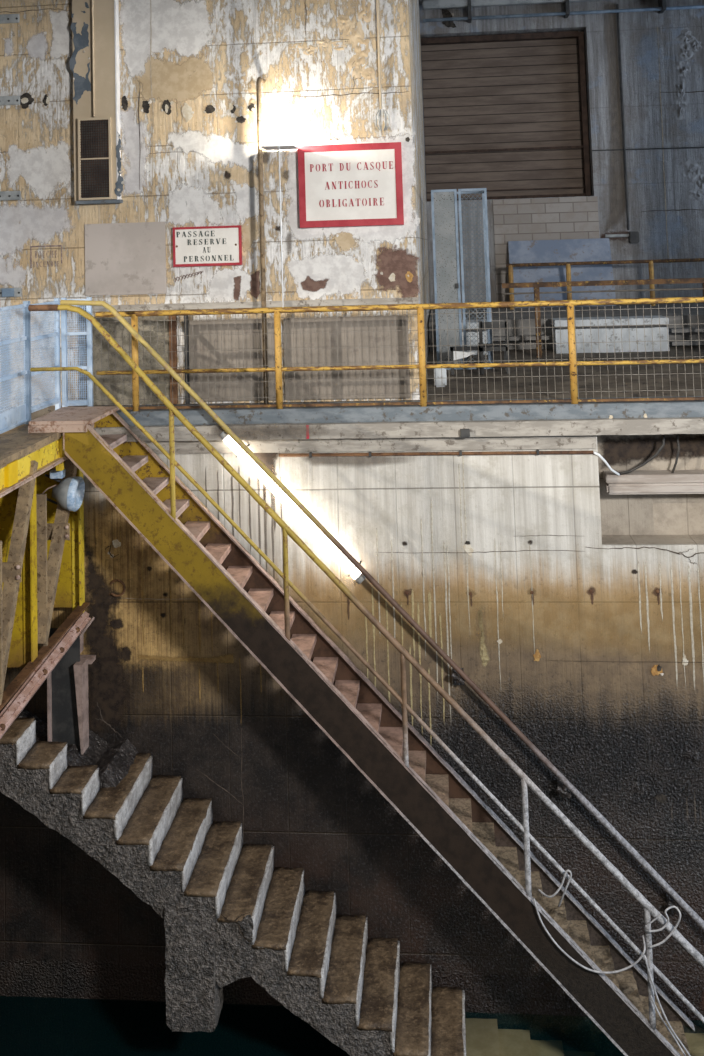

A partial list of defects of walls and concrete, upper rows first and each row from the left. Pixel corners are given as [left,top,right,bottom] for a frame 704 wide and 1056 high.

peeling [119,0,214,78]
peeling [0,140,74,288]
peeling [114,96,259,227]
peeling [284,134,420,244]
peeling [205,266,252,303]
rust [301,276,328,292]
peeling [286,253,369,300]
damp [84,540,242,732]
damp [365,500,453,741]
damp [458,450,503,683]
crack [380,535,704,564]
efflorescence [638,563,704,686]